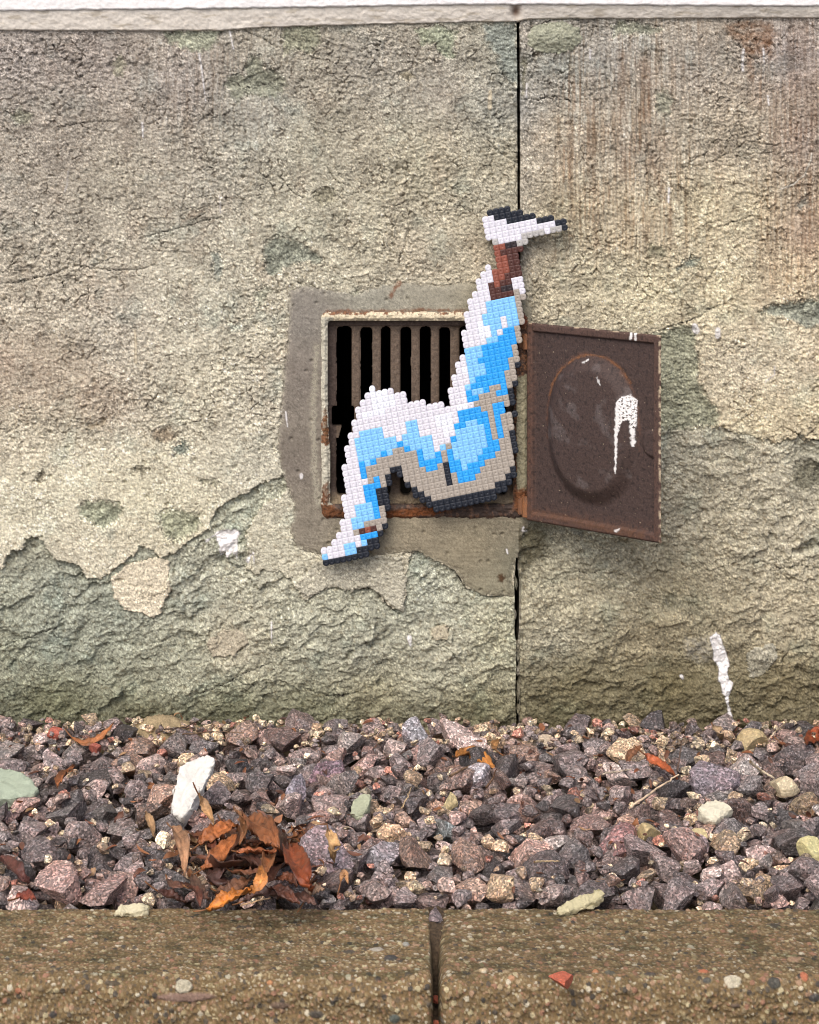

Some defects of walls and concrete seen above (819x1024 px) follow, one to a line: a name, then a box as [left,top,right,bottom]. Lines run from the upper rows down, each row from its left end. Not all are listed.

corrosion [322,483,345,518]
corrosion [386,508,441,518]
spalling [0,323,819,739]